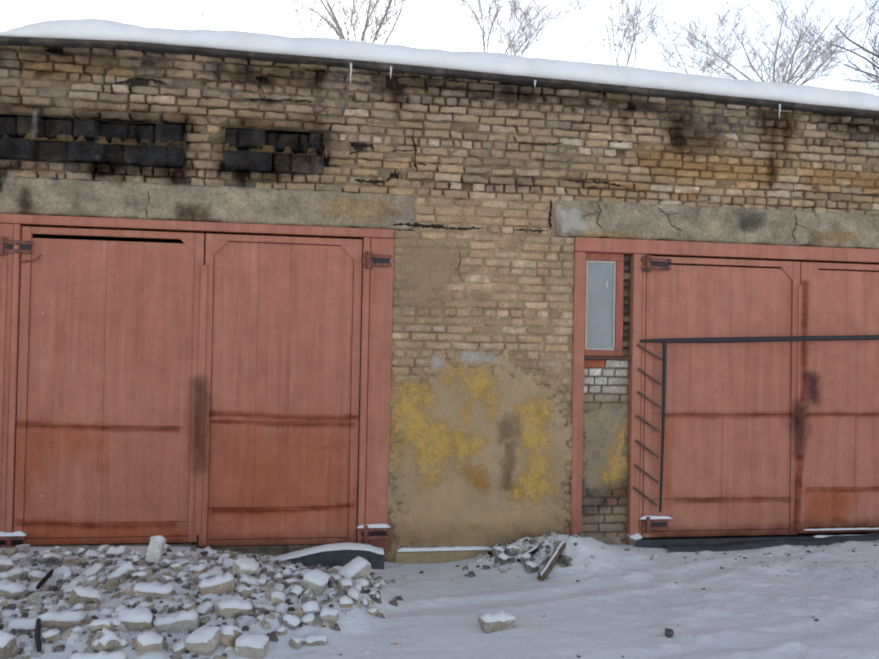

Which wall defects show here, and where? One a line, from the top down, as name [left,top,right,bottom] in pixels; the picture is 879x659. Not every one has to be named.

crack [513,200,552,232]
crack [561,172,622,230]